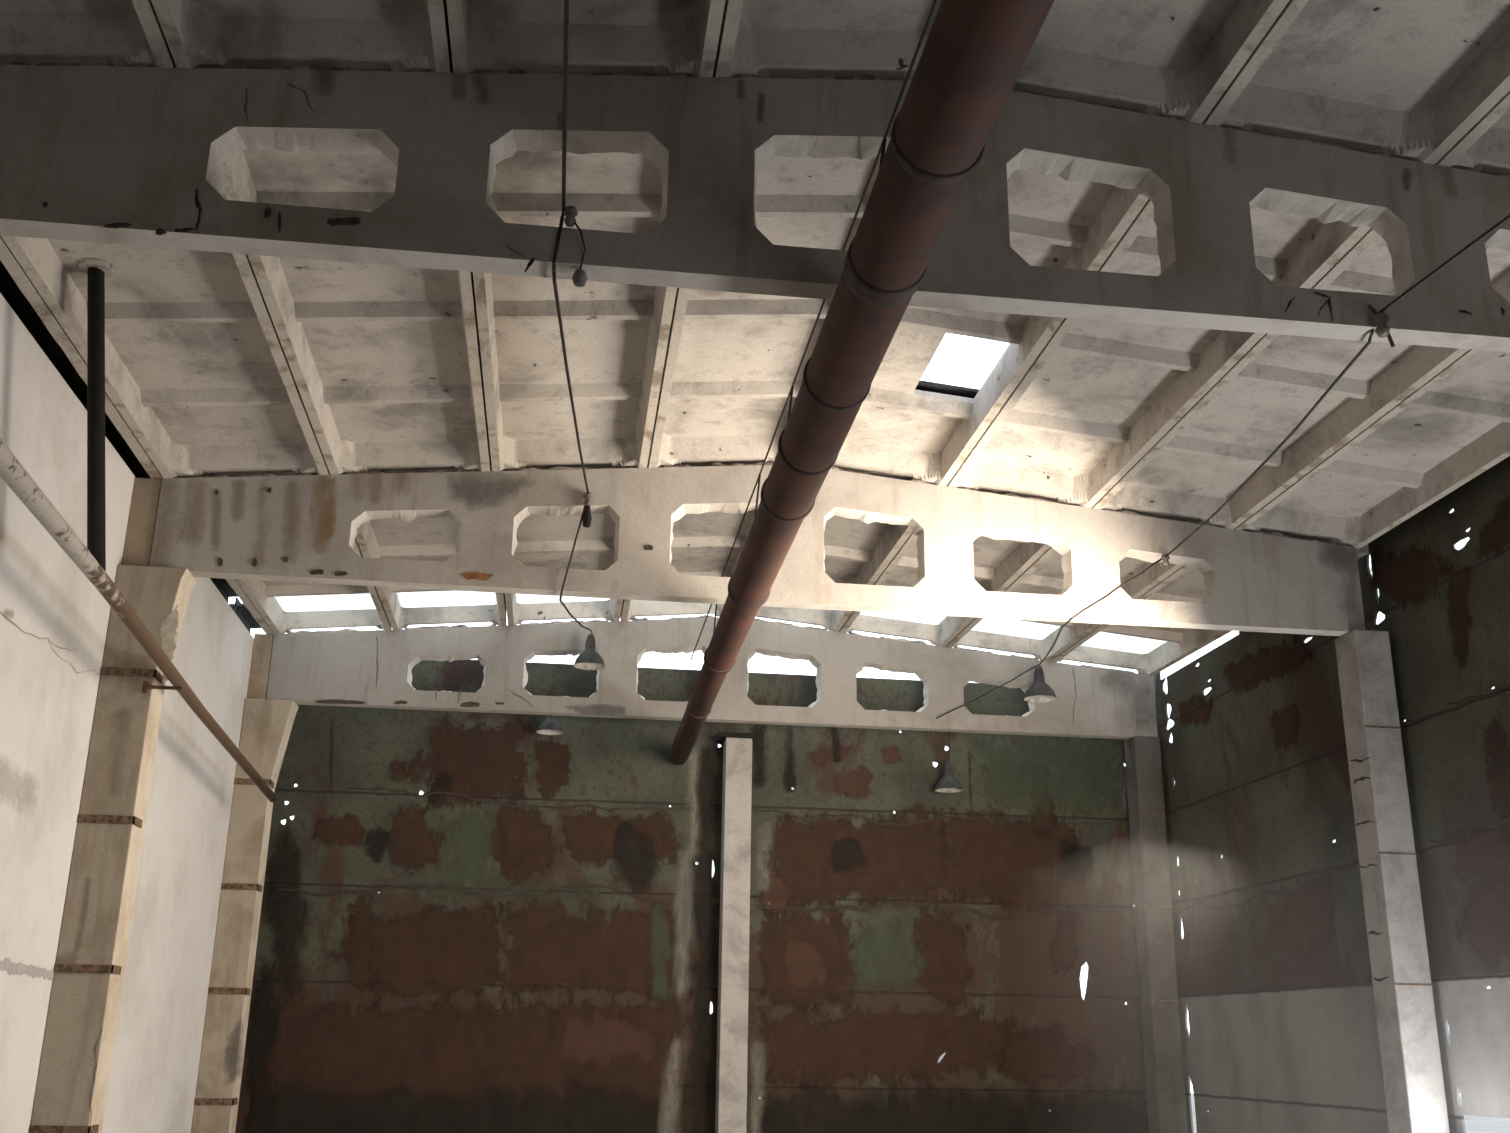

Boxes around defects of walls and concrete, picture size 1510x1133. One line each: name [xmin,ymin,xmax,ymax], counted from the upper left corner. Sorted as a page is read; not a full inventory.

crack [0,611,100,675]
corrosion [1177,694,1213,726]
corrosion [1223,636,1313,693]
corrosion [1370,498,1510,670]
corrosion [314,718,571,875]
corrosion [758,745,949,1010]